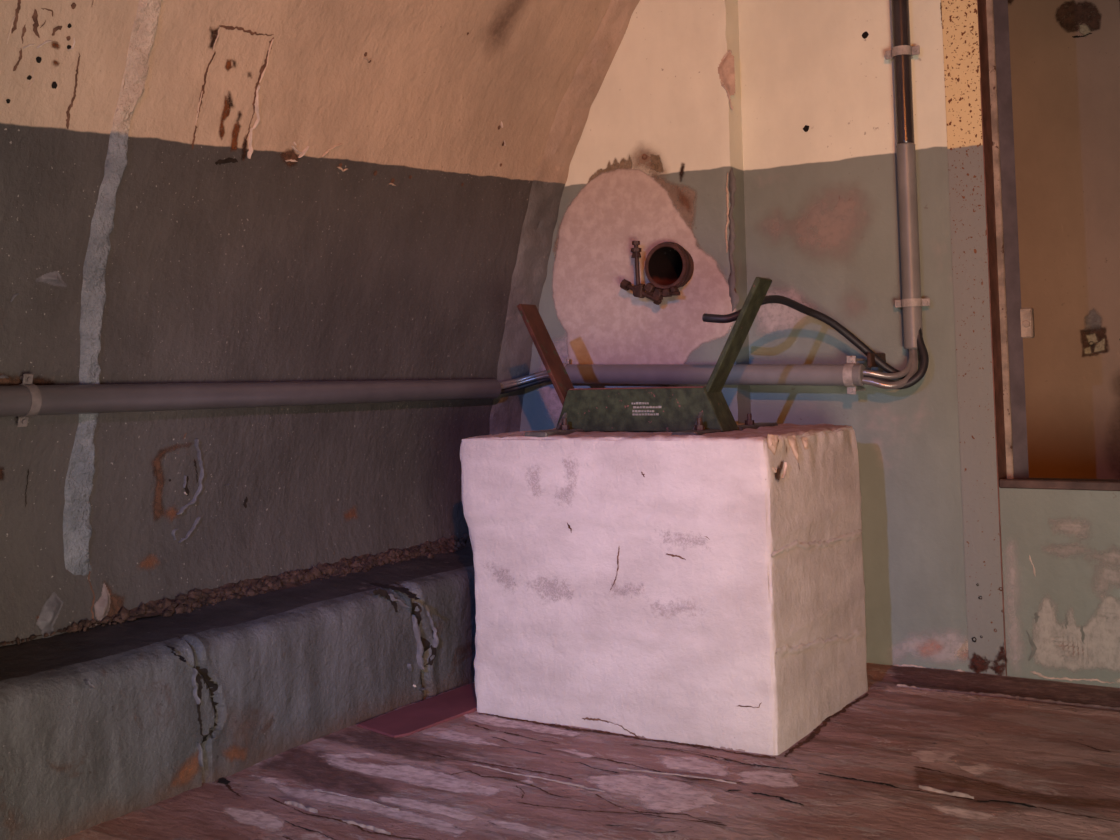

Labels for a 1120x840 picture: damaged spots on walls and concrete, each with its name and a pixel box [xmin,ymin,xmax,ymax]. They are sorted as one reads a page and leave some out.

spalling [6,0,76,87]
flaking render [725,168,739,312]
spalling [152,434,204,543]
crack [164,645,241,797]
crack [268,789,422,840]
crack [369,583,439,691]
crack [412,717,1118,833]
peeling [894,633,1120,707]